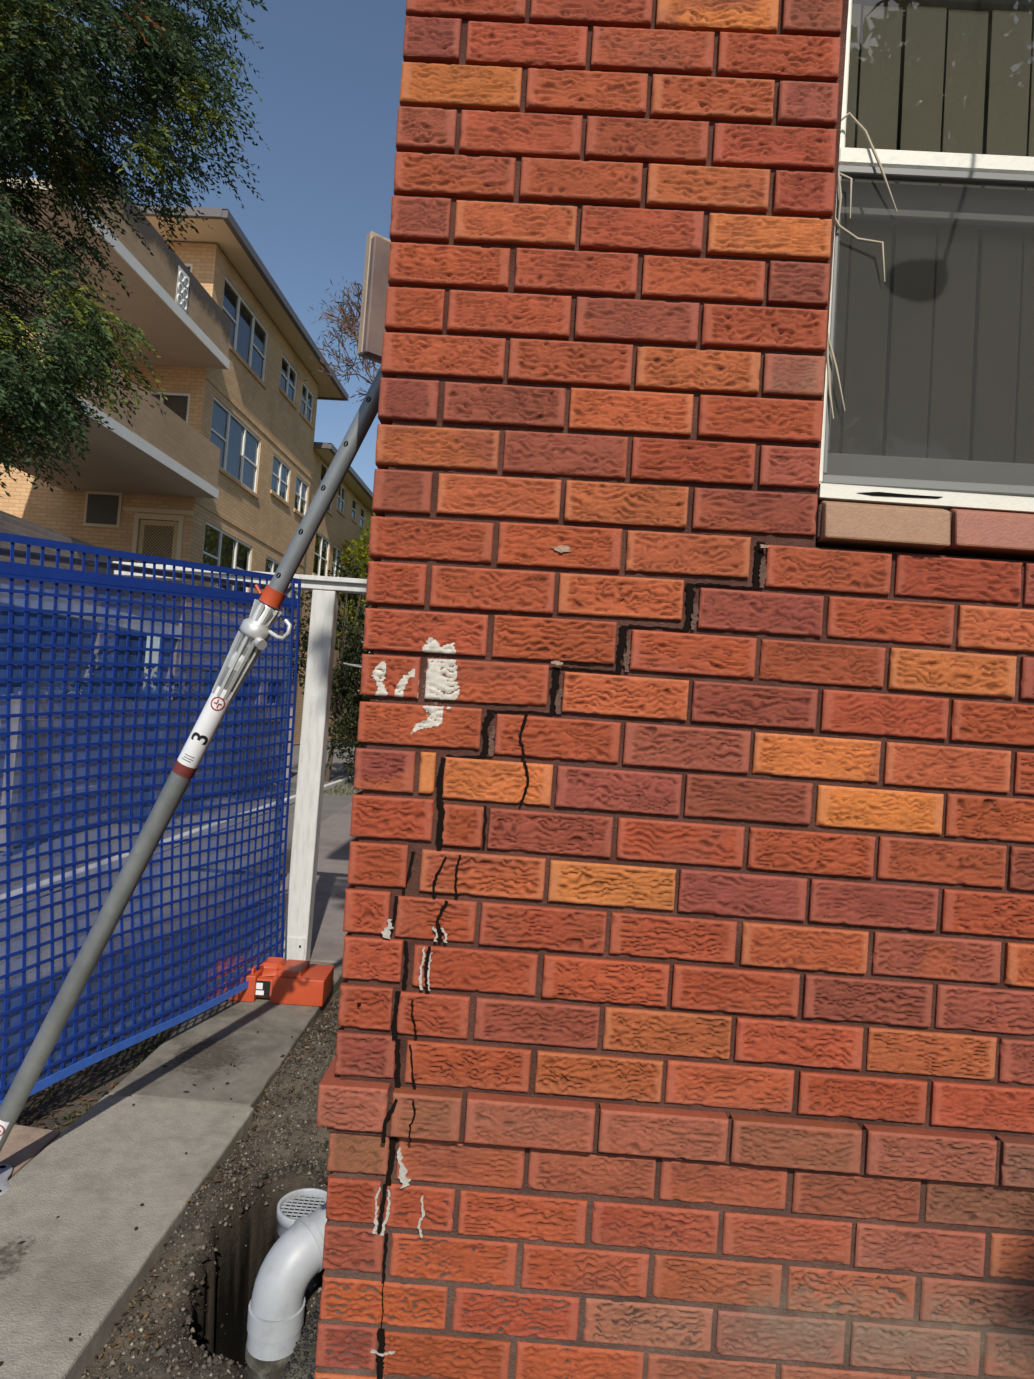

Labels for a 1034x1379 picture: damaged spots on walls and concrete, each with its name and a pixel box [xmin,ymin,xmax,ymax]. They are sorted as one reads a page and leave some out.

crack [375,541,767,1379]